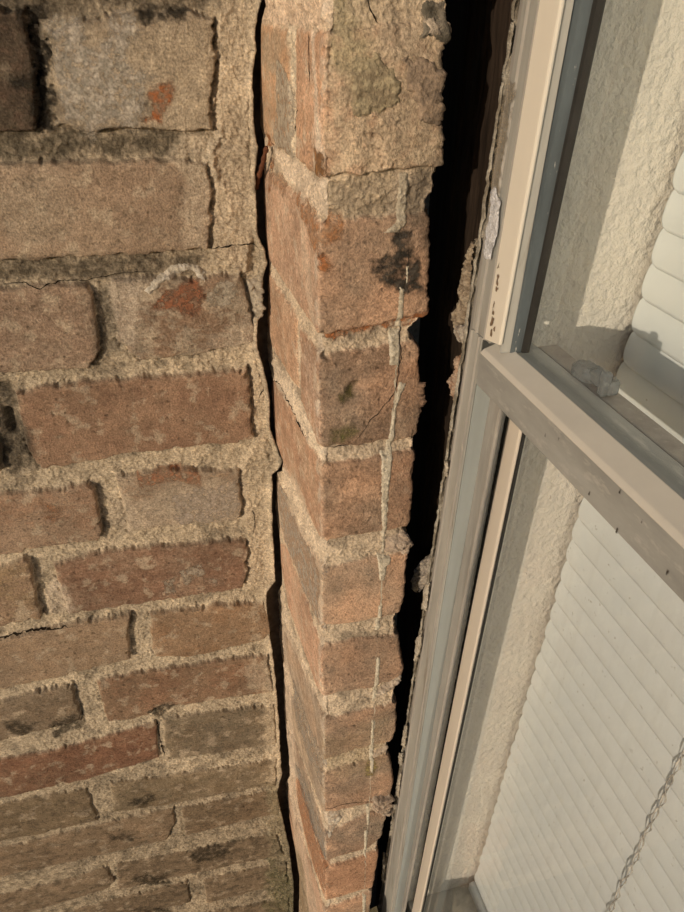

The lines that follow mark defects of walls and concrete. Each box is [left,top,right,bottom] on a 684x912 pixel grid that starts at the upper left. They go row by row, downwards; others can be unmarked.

corrosion [142,83,174,122]
water stain [371,231,423,294]
spalling [447,355,461,398]
crack [212,0,309,912]
crack [0,625,70,639]